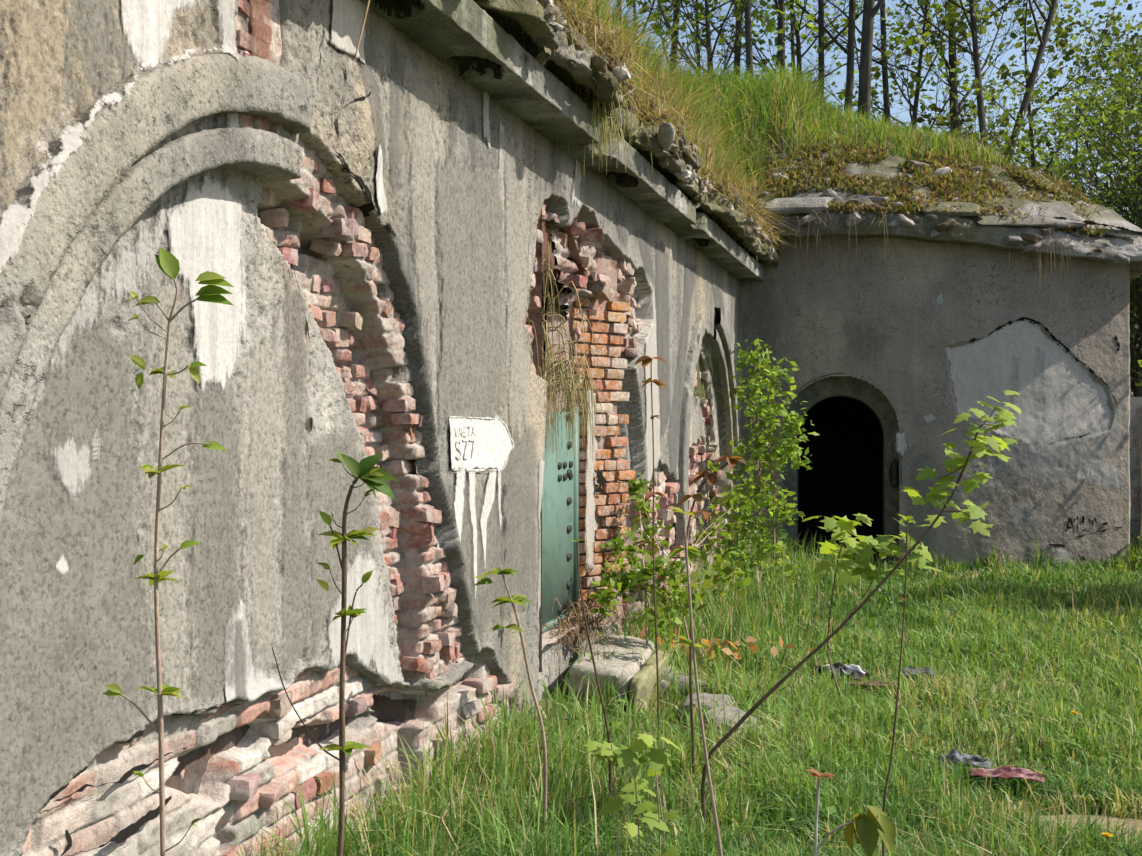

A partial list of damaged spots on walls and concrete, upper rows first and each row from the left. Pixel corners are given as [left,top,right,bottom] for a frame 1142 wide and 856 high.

flaking render [235,0,282,65]
flaking render [238,114,271,131]
flaking render [524,202,642,373]
flaking render [945,319,1112,464]
crack [951,317,1118,405]
flaking render [21,139,516,856]
flaking render [617,370,737,635]